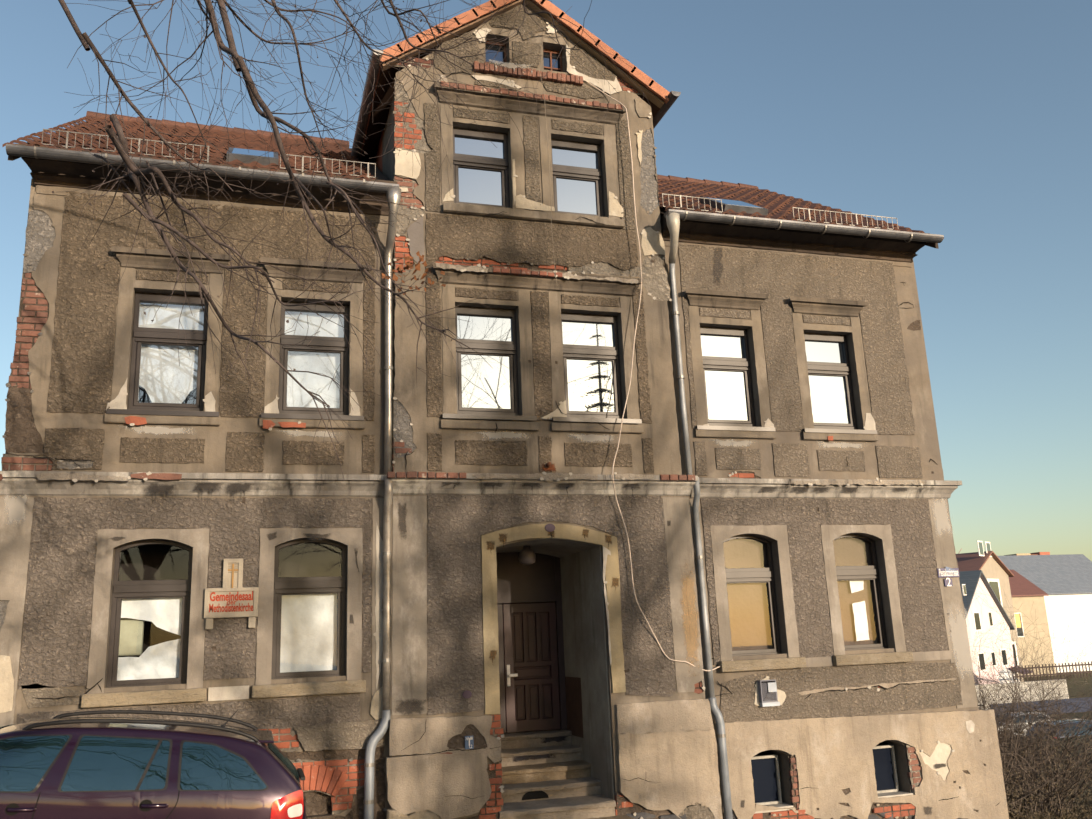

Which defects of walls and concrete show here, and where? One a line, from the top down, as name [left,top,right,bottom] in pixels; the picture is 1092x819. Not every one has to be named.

peeling [473,28,491,43]
spalling [393,57,433,154]
spalling [433,44,672,301]
flaking render [394,176,425,274]
flaking render [0,210,182,483]
spalling [441,715,504,754]
flaking render [258,726,387,819]
flaking render [478,760,505,819]
flaking render [615,791,643,819]
peeling [678,802,716,819]
flaking render [871,803,915,819]
peeling [906,741,970,790]